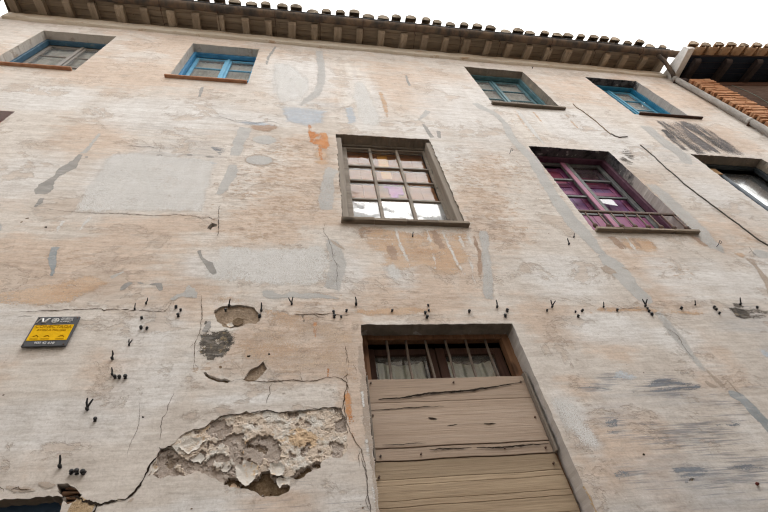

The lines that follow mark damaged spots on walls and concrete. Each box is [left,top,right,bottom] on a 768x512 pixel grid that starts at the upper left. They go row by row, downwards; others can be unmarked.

rust [308,125,330,166]
water stain [655,120,725,155]
flaking render [214,306,260,328]
water stain [728,303,768,319]
flaking render [245,353,270,382]
crack [76,346,371,512]
flaking render [150,407,348,497]